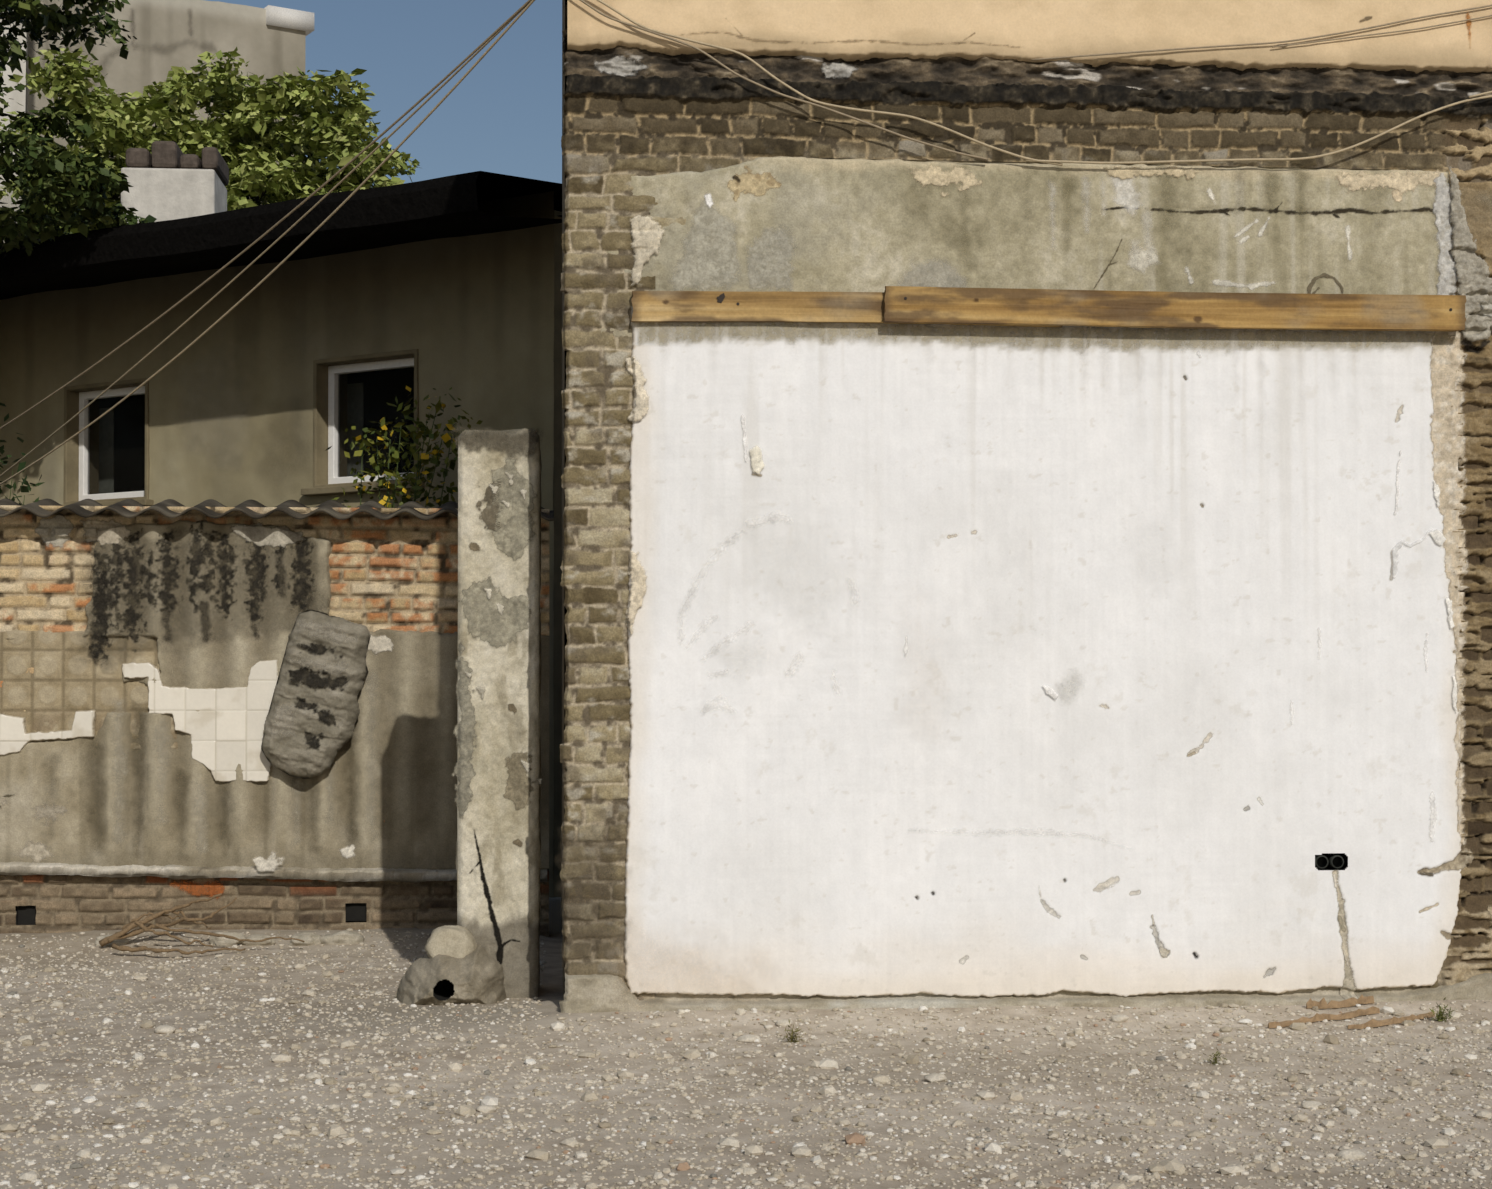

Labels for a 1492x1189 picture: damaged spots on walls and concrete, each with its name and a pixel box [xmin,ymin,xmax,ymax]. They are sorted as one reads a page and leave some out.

spalling [727,166,781,201]
spalling [910,165,982,197]
crack [1094,203,1433,288]
damp [19,841,50,863]
damp [253,852,283,872]
damp [340,829,355,858]
crack [470,835,520,965]